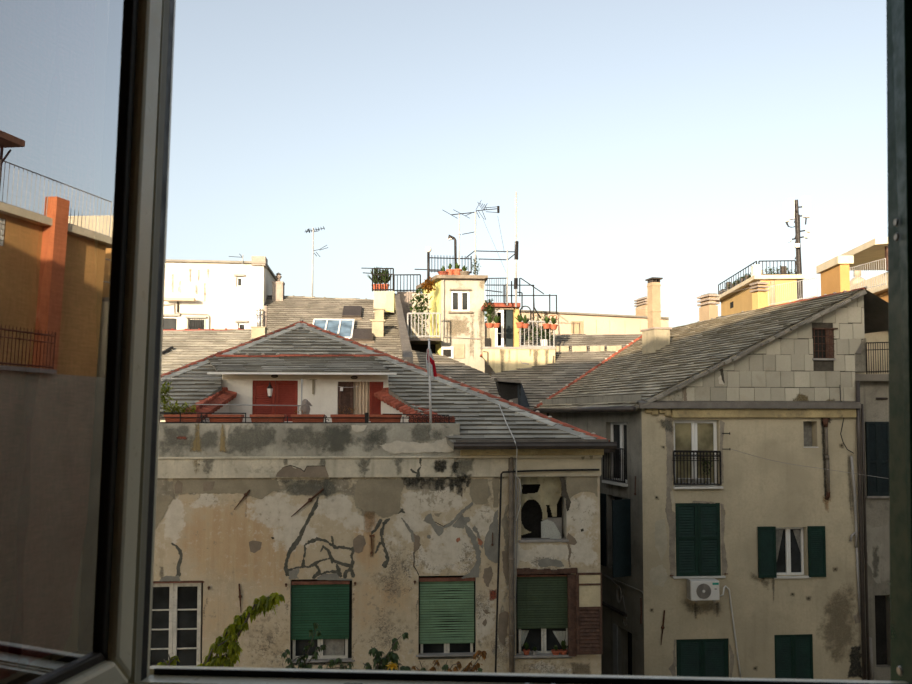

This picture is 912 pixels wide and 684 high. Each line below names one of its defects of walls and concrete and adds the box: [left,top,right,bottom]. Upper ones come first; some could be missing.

water stain [161,424,274,473]
water stain [288,425,353,452]
water stain [361,427,386,472]
peeling [155,459,329,530]
crack [159,543,183,582]
crack [284,497,405,580]
peeling [354,478,499,587]